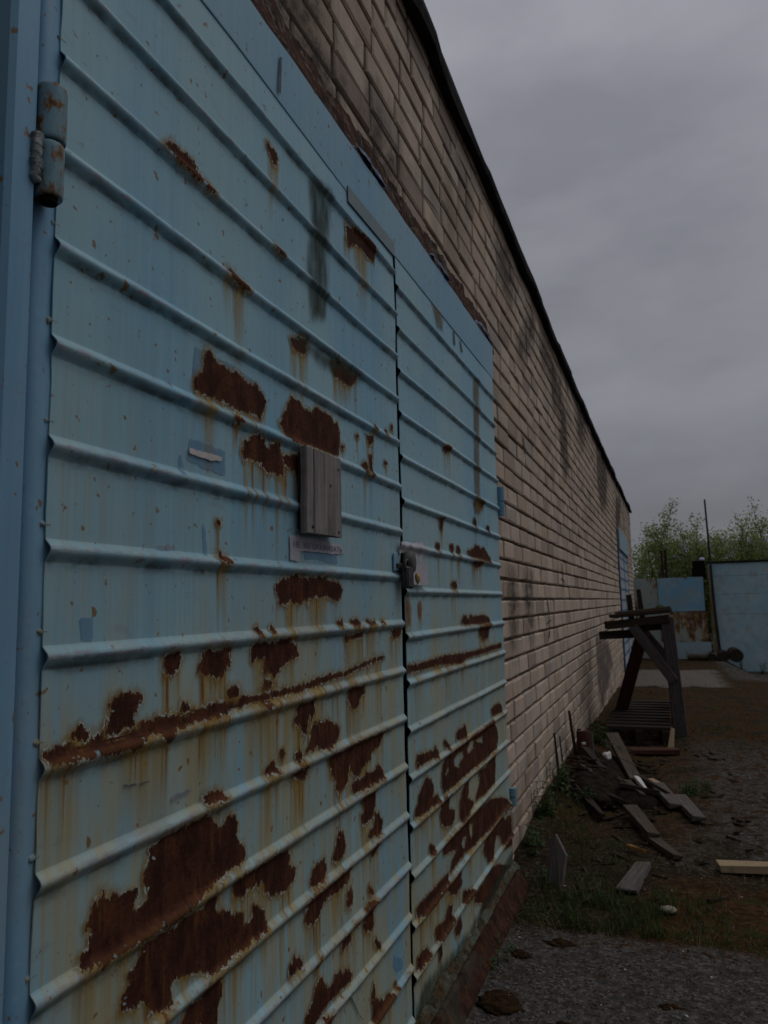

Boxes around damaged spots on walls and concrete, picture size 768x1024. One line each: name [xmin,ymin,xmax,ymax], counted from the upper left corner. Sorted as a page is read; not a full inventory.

corrosion [162,137,220,200]
corrosion [344,221,377,277]
corrosion [193,345,393,523]
corrosion [42,572,422,860]
corrosion [76,785,296,1024]
corrosion [371,702,514,1024]